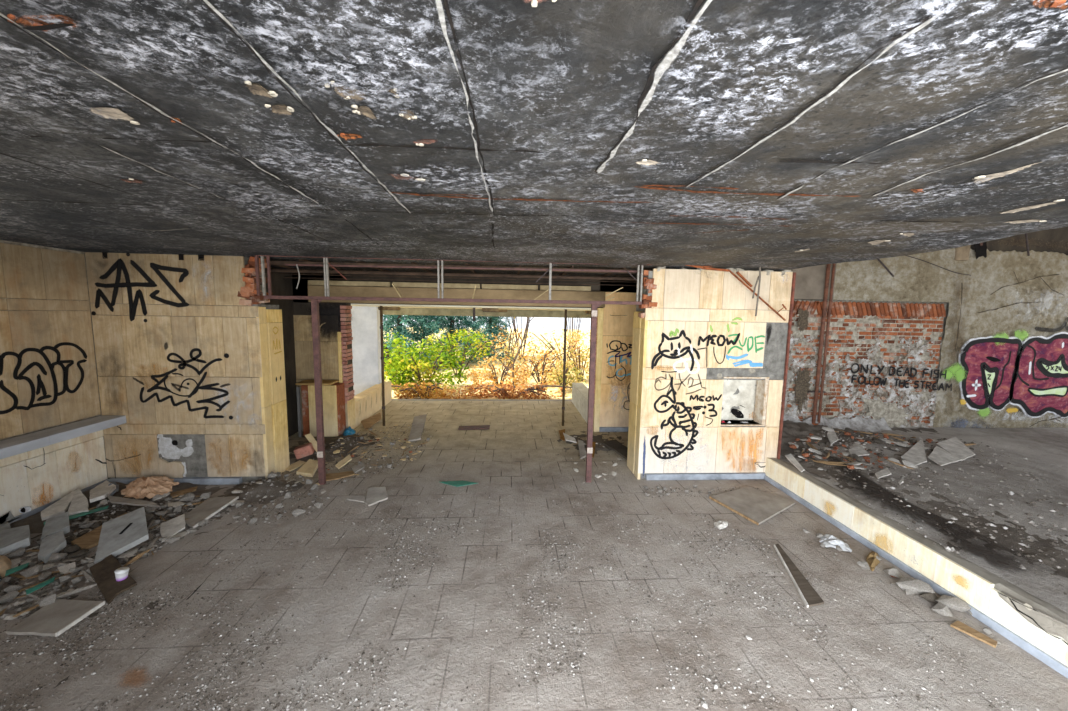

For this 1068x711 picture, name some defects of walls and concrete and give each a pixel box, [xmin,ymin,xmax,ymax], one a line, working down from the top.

spalling [7,14,78,32]
peeling [89,107,140,125]
spalling [388,88,417,120]
spalling [863,397,909,428]
spalling [157,434,208,477]
crack [998,592,1068,645]